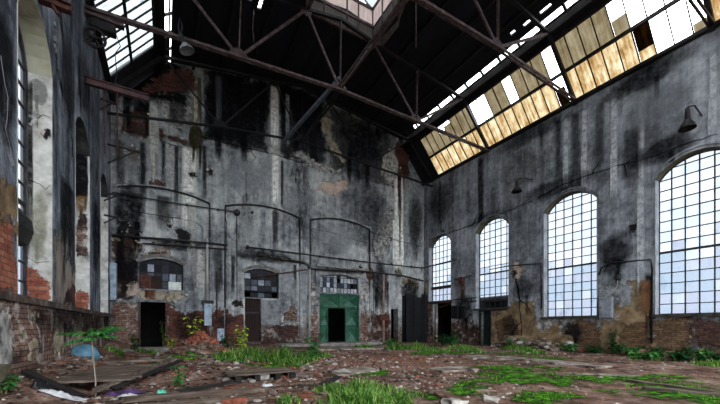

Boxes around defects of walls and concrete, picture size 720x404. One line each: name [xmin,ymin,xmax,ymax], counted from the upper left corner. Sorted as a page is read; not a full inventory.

flaking render [118,68,198,161]
leakage [263,86,289,203]
peeling [293,114,350,196]
flaking render [0,175,244,376]
flaking render [360,278,391,342]
flaking render [491,280,720,352]